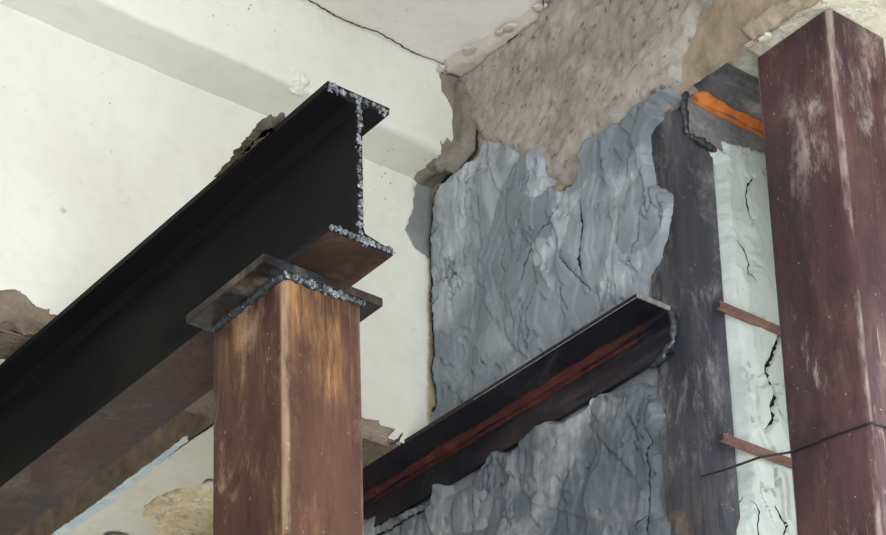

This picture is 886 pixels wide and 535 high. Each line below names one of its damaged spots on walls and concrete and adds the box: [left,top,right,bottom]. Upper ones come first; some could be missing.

crack [308,0,444,65]
flaking render [740,0,830,42]
flaking render [413,0,714,189]
flaking render [0,289,57,359]
rust [363,327,643,505]
crack [764,338,778,429]
peeling [142,480,213,535]
crack [739,497,788,535]